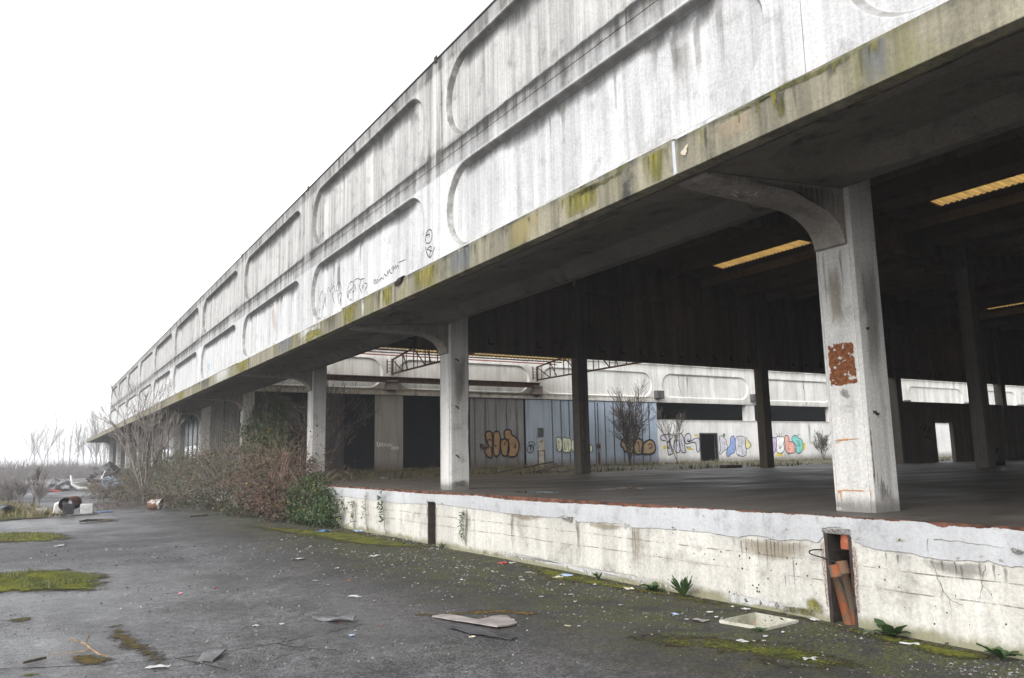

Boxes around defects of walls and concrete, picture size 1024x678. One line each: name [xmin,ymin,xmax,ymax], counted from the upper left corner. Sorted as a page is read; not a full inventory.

leakage [866,38,881,65]
leakage [453,245,475,267]
crack [927,539,1003,618]